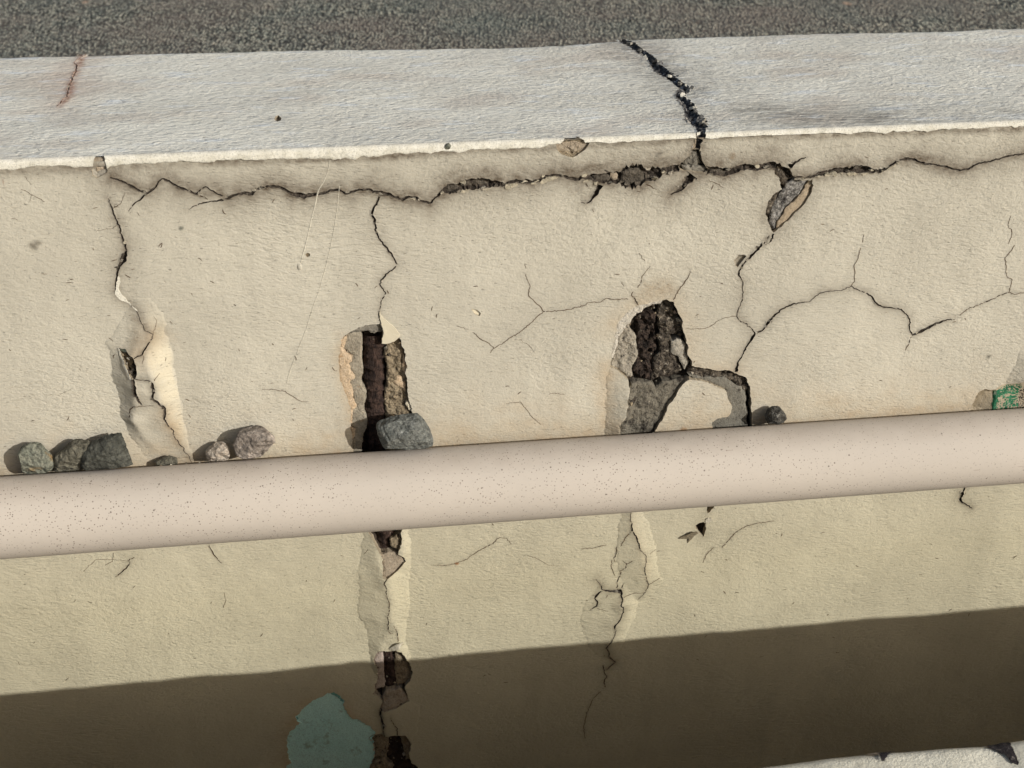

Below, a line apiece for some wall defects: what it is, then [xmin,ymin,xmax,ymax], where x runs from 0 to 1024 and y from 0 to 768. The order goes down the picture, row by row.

spalling [765,163,813,232]
crack [97,39,1024,461]
spalling [118,348,137,380]
spalling [339,312,412,453]
spalling [610,299,752,435]
peeling [970,382,1024,412]
spalling [368,530,406,580]
crack [583,514,660,737]
spalling [371,642,413,713]
peeling [286,692,418,768]